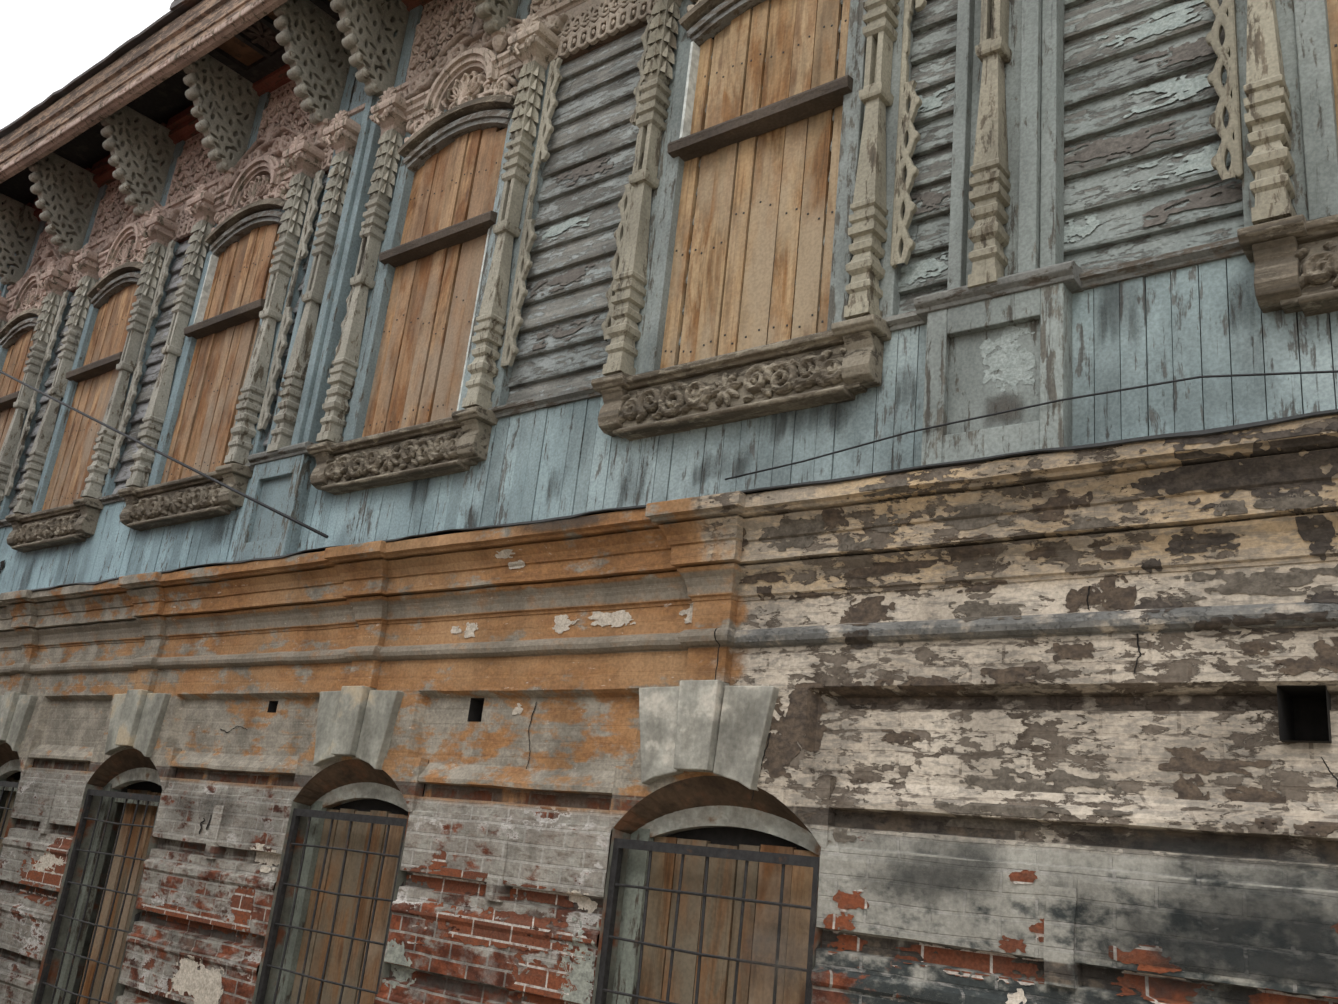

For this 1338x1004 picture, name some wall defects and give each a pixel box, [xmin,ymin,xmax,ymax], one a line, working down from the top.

peeling [552,610,636,634]
peeling [739,572,822,601]
peeling [839,596,896,649]
peeling [742,478,1016,578]
peeling [1025,417,1338,675]
peeling [759,675,973,778]
peeling [933,766,1133,837]
peeling [1158,747,1286,830]
peeling [165,955,224,1004]
flaking render [403,850,599,1004]
flaking render [823,889,869,955]
flaking render [892,918,1044,1004]